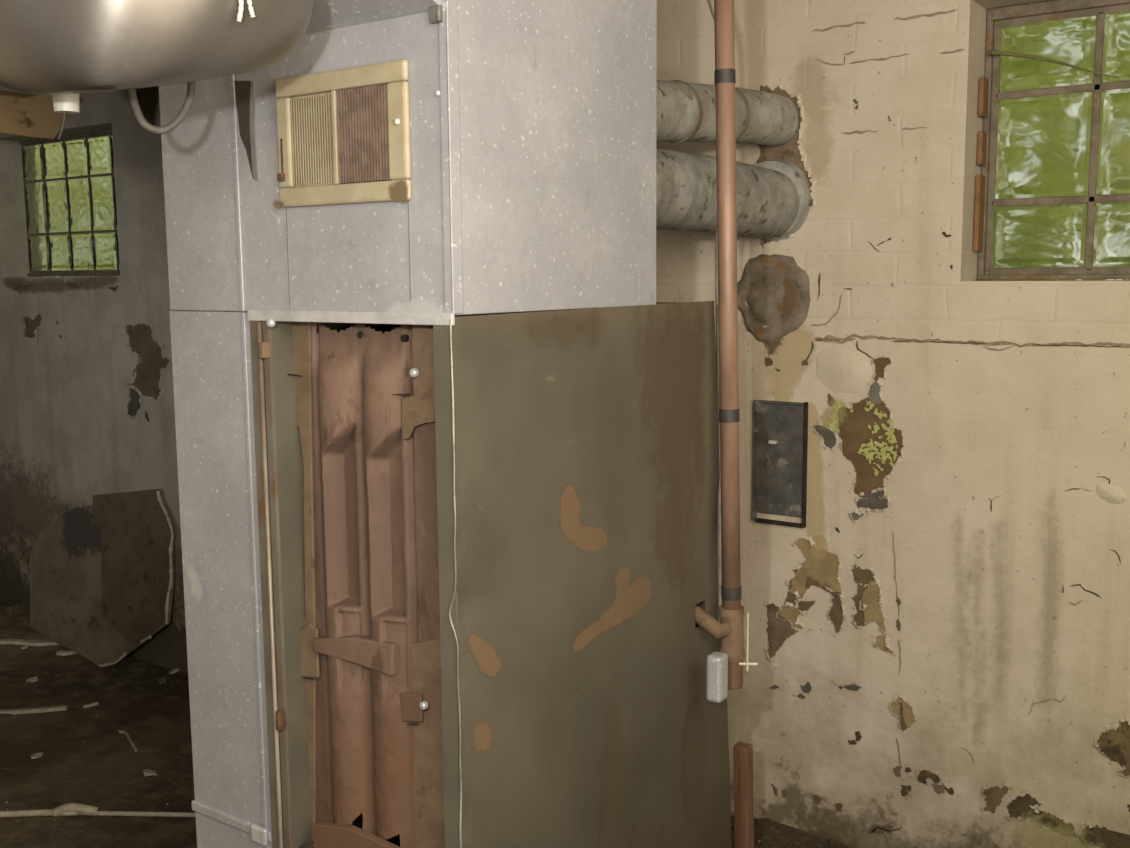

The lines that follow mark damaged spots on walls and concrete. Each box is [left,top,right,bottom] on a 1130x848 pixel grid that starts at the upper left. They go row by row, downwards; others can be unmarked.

peeling [23,314,41,344]
crack [804,274,1130,364]
peeling [125,323,170,421]
peeling [811,354,904,524]
peeling [763,536,897,663]
spalling [887,695,920,731]
spalling [893,766,954,796]
peeling [1093,717,1130,780]
leakage [870,824,893,834]
peeling [979,782,1130,848]